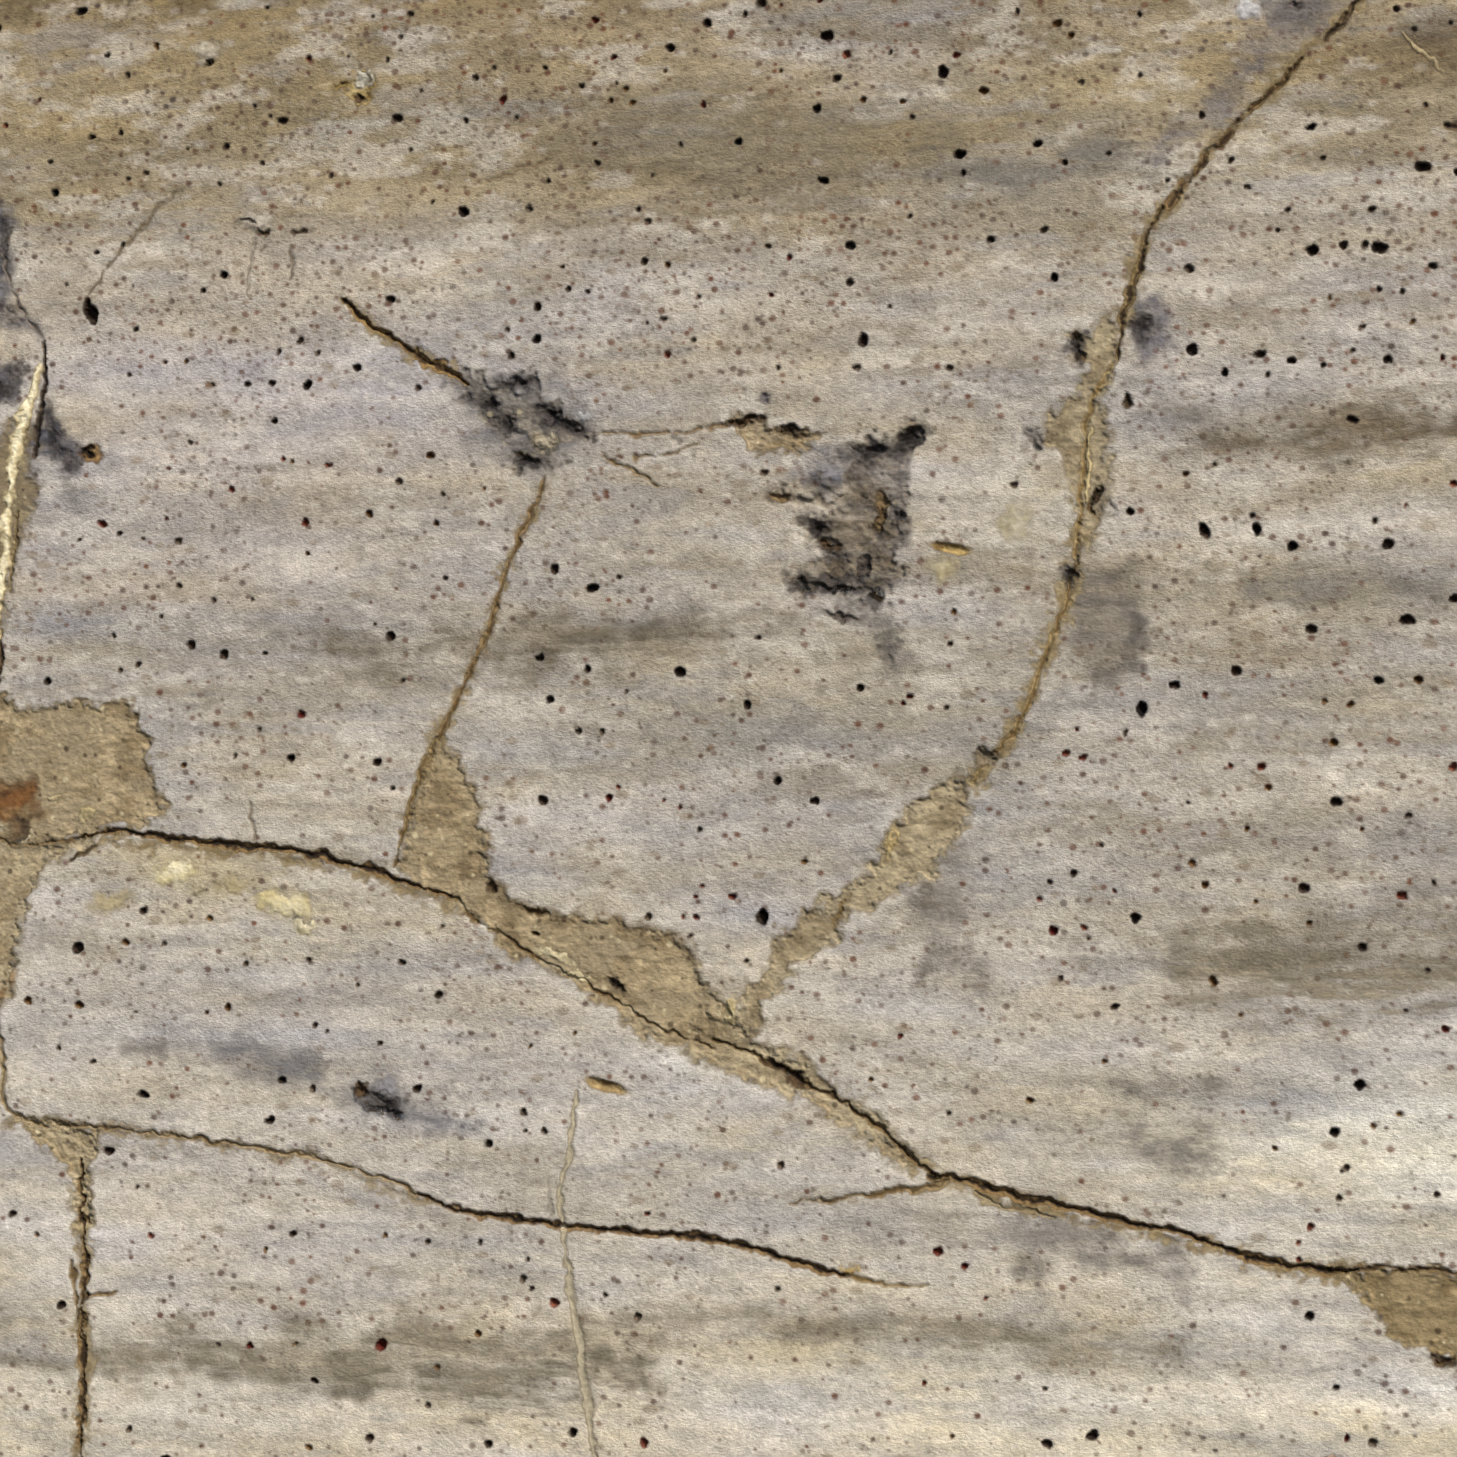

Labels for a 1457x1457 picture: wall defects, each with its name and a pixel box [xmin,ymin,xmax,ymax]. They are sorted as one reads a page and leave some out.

crack [0,252,48,674]
crack [340,298,469,386]
leakage [463,388,588,459]
crack [593,419,733,487]
crack [968,0,1366,797]
spalling [0,691,171,1007]
spalling [153,861,204,895]
spalling [224,878,314,935]
spalling [392,742,979,1170]
crack [0,476,1457,1286]
crack [0,1036,929,1457]
spalling [1327,1260,1457,1367]